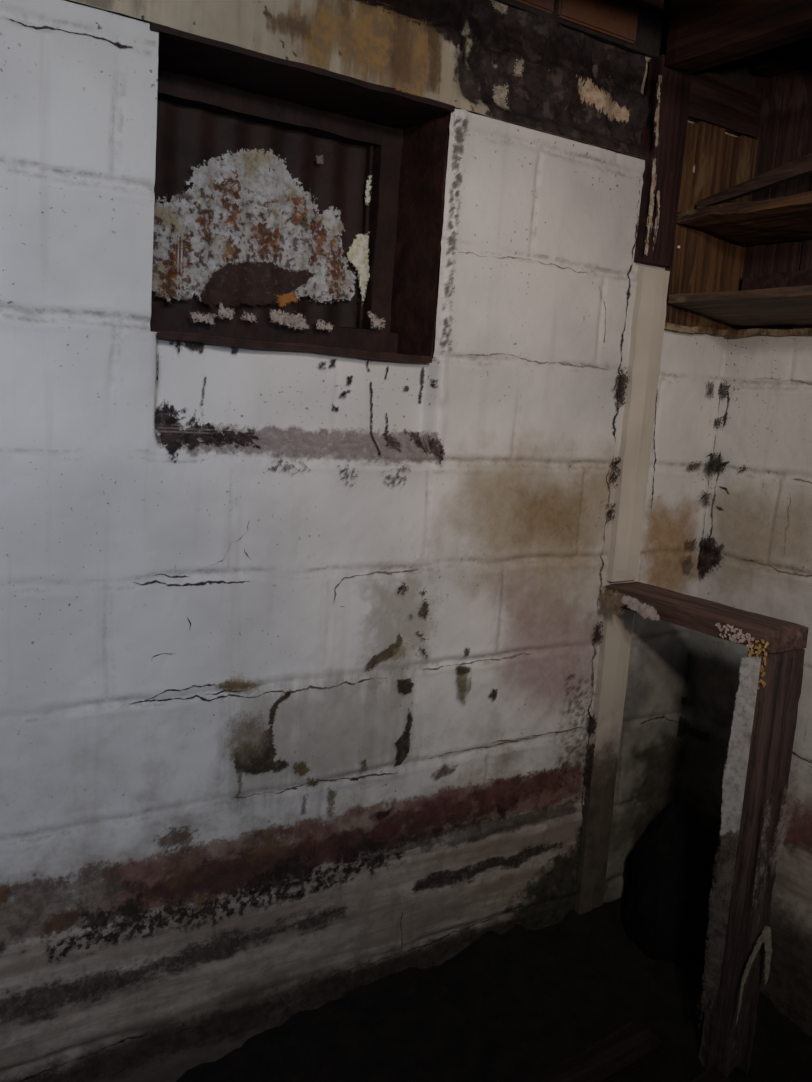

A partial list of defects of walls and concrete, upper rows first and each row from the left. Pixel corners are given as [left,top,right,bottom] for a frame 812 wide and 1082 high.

crack [7,18,132,49]
peeling [576,75,629,123]
peeling [152,148,386,331]
mould [614,367,630,409]
crack [422,183,640,811]
mould [687,450,726,506]
crack [134,523,249,586]
water stain [646,510,726,590]
crack [132,678,386,704]
spalling [230,690,292,800]
spalling [394,708,413,767]
water stain [0,826,583,1082]